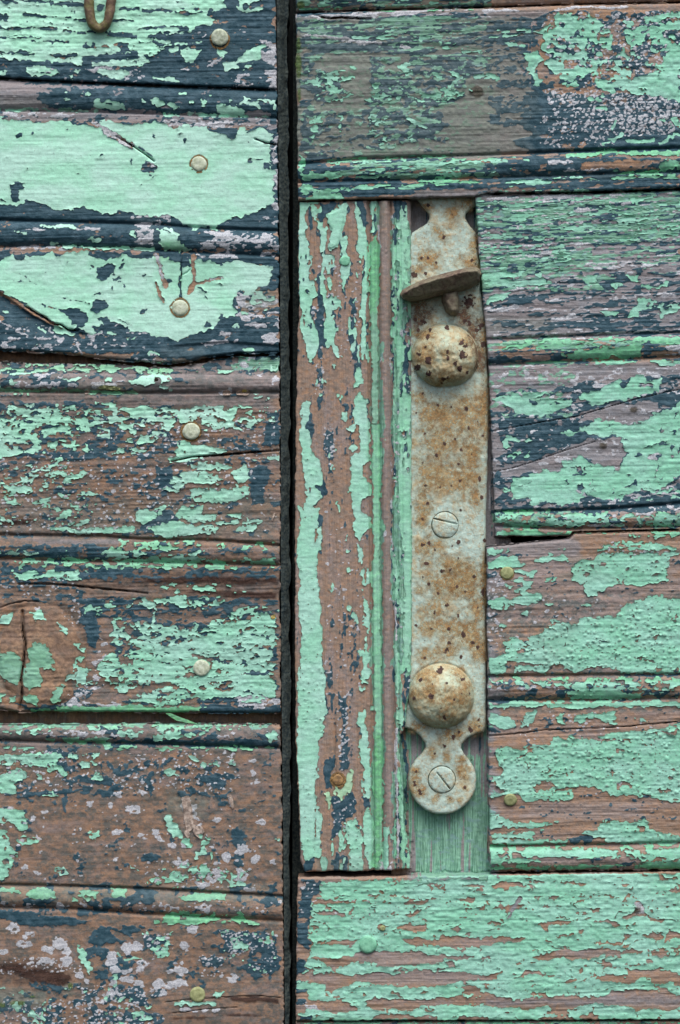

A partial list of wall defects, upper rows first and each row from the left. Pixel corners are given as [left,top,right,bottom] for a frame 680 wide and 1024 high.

peeling [0,0,276,342]
corrosion [411,252,439,278]
corrosion [423,198,472,240]
peeling [0,351,279,581]
crack [180,450,279,460]
corrosion [410,294,488,802]
peeling [296,11,680,1024]
peeling [0,583,279,794]
peeling [0,808,56,900]
peeling [77,945,93,975]
peeling [72,887,127,902]
peeling [117,796,275,973]